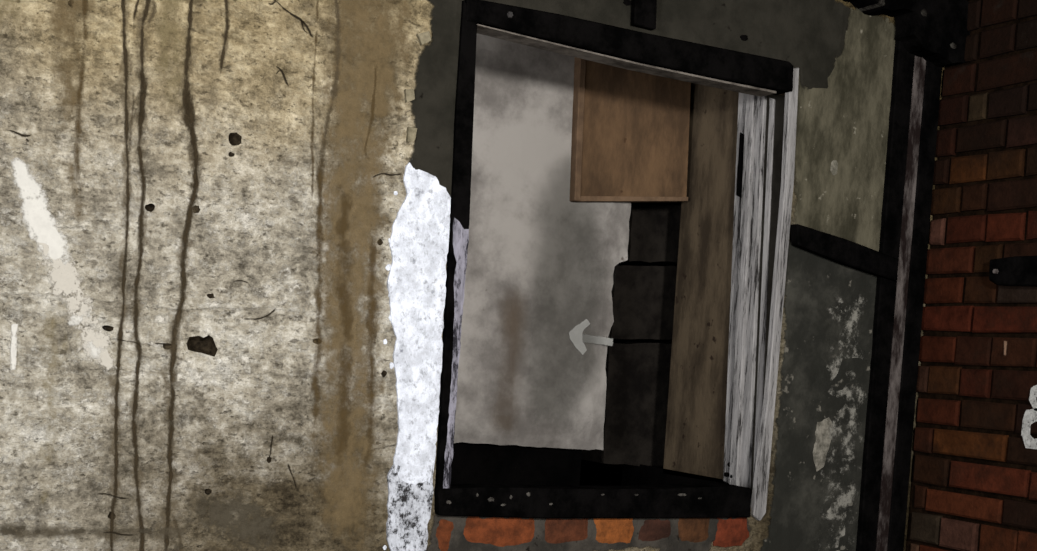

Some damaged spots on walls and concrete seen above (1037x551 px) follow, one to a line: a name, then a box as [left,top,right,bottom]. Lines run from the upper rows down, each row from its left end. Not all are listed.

flaking render [484,0,850,89]
leakage [0,525,84,537]
leakage [98,0,280,551]
spalling [187,335,218,357]
peeling [377,0,751,551]
flaking render [760,241,877,551]